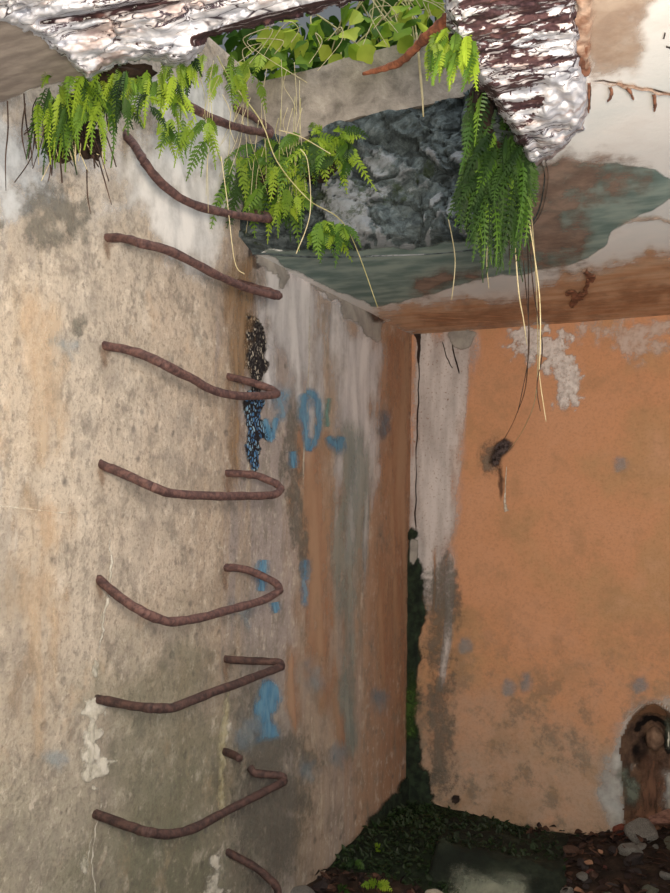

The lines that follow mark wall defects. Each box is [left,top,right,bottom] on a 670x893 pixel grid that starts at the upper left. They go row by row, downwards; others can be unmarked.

peeling [249,249,290,289]
spalling [565,268,596,308]
rust [225,258,254,470]
damp [259,156,670,757]
crack [100,540,113,643]
damp [81,698,116,790]
damp [598,701,670,826]
crack [87,804,102,893]
damp [204,855,231,893]